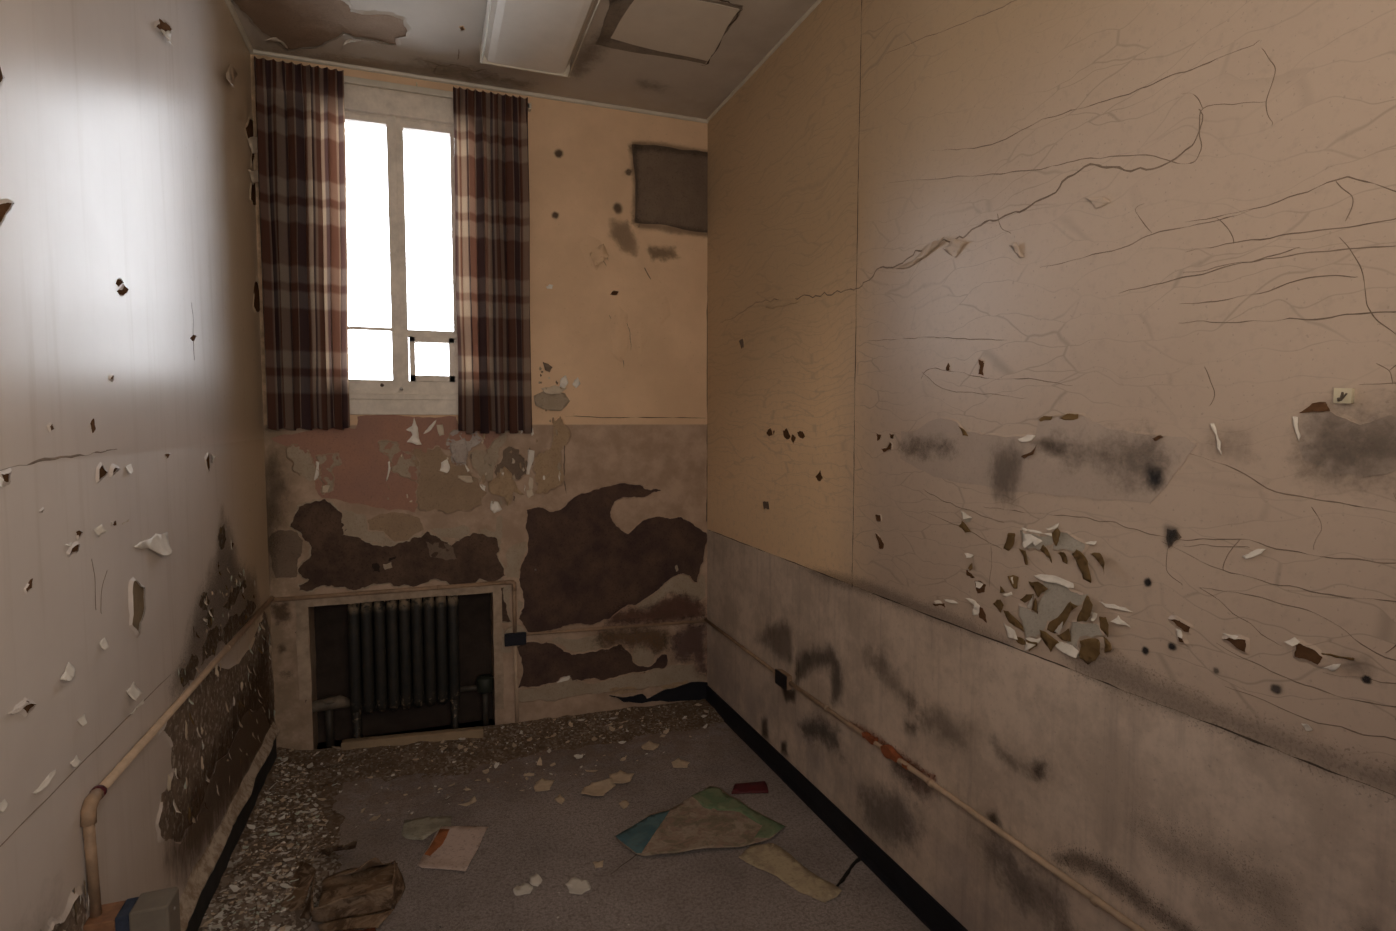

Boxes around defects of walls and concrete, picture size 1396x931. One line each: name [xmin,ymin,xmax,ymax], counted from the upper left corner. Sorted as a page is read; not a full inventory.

peeling [230,0,411,51]
peeling [0,199,15,226]
crack [720,0,1396,385]
peeling [116,278,129,296]
crack [855,334,1071,399]
crack [563,416,689,493]
peeling [128,577,146,638]
flaking render [268,415,707,806]
peeling [933,523,1132,665]
crack [706,454,1396,796]
flaking render [155,524,275,848]
water stain [783,648,840,701]